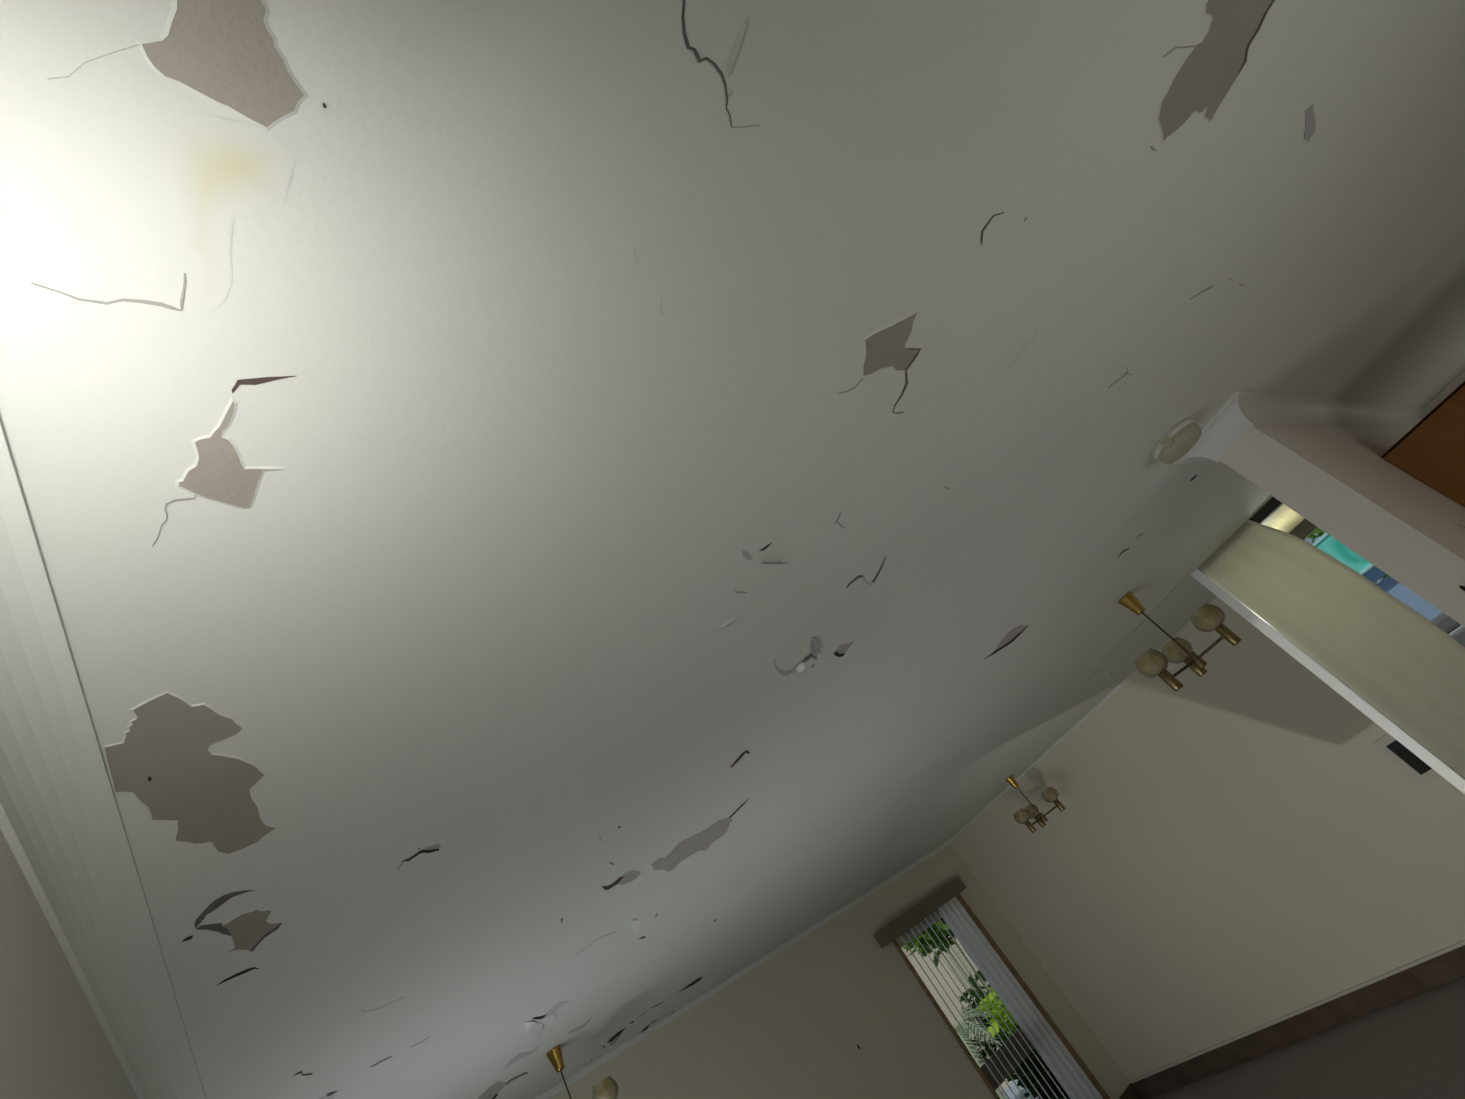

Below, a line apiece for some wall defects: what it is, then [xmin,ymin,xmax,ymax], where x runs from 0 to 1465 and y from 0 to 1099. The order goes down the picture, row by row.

peeling [48,0,326,131]
crack [682,0,760,128]
peeling [1151,0,1275,152]
crack [31,273,186,311]
peeling [837,309,921,414]
peeling [152,376,295,547]
peeling [102,690,277,854]
peeling [602,798,749,890]
peeling [182,890,284,954]
peeling [478,1072,528,1099]